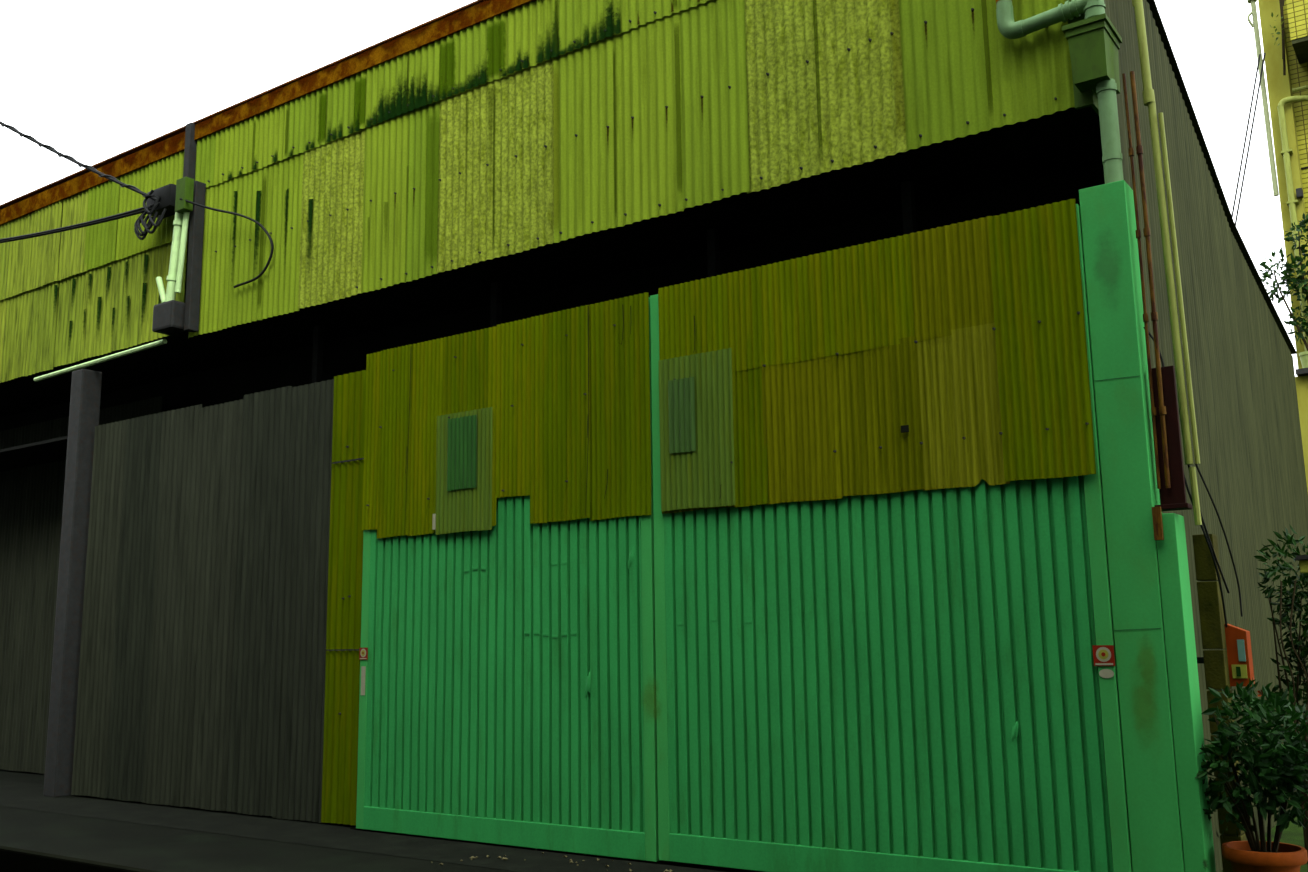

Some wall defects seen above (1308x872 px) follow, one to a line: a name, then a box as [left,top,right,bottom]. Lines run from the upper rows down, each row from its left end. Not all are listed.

rust [355,0,491,59]
rust [298,63,339,85]
rust [197,87,283,129]
rust [102,133,183,172]
damp [228,0,621,304]